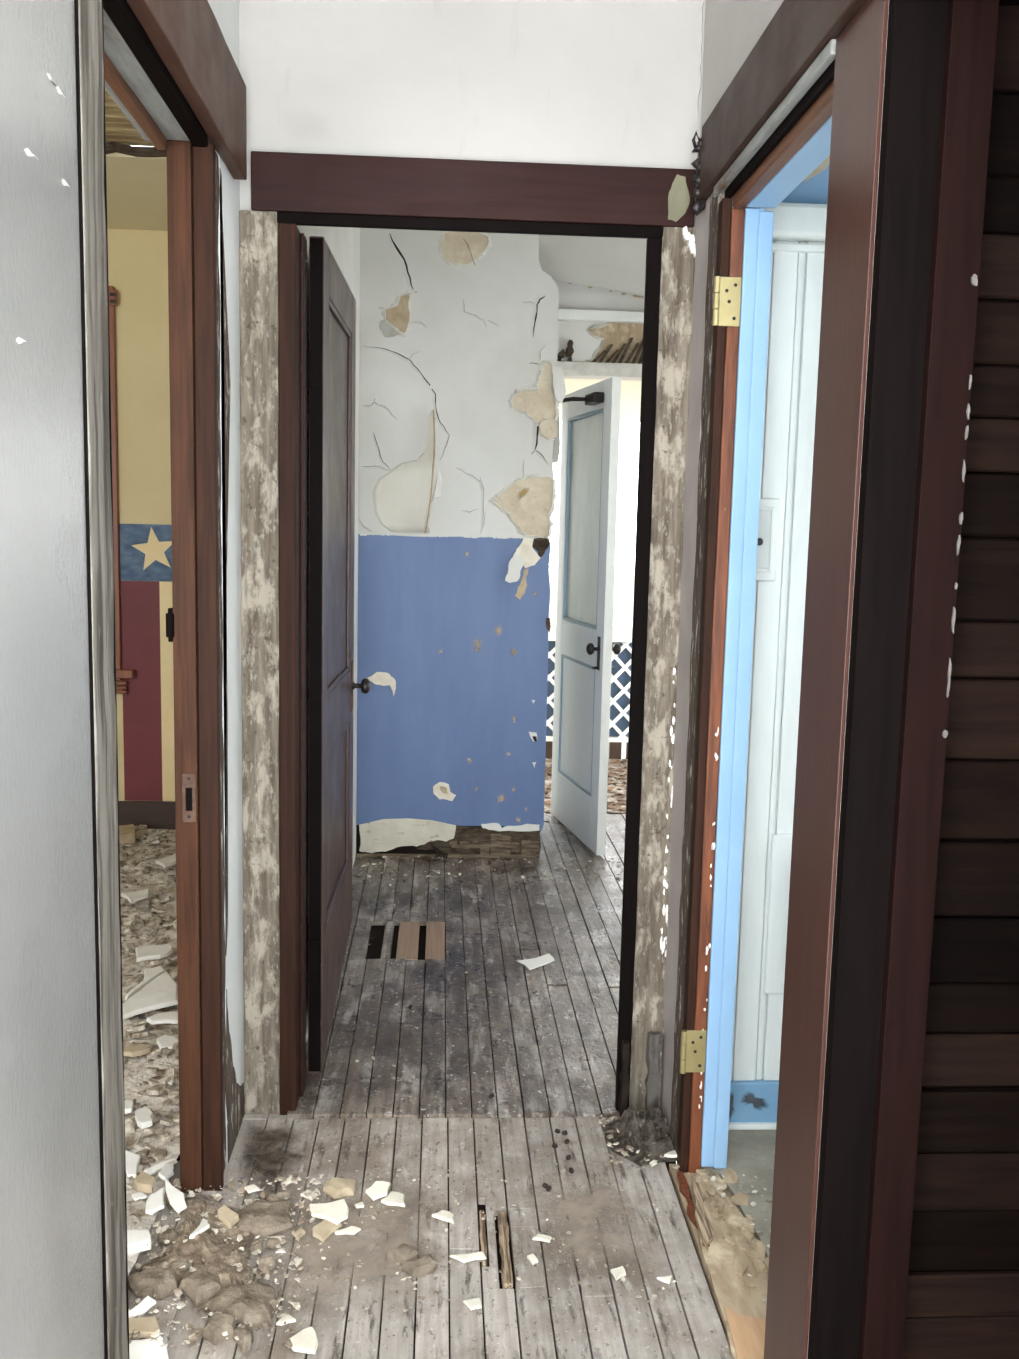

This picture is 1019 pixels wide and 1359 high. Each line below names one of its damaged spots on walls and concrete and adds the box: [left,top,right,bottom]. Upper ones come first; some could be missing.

flaking render [437,231,492,268]
flaking render [379,290,415,337]
crack [463,295,546,366]
crack [361,233,486,533]
flaking render [360,310,644,600]
crack [522,425,549,477]
peeling [367,672,396,697]
peeling [433,782,456,801]
flaking render [356,818,541,860]